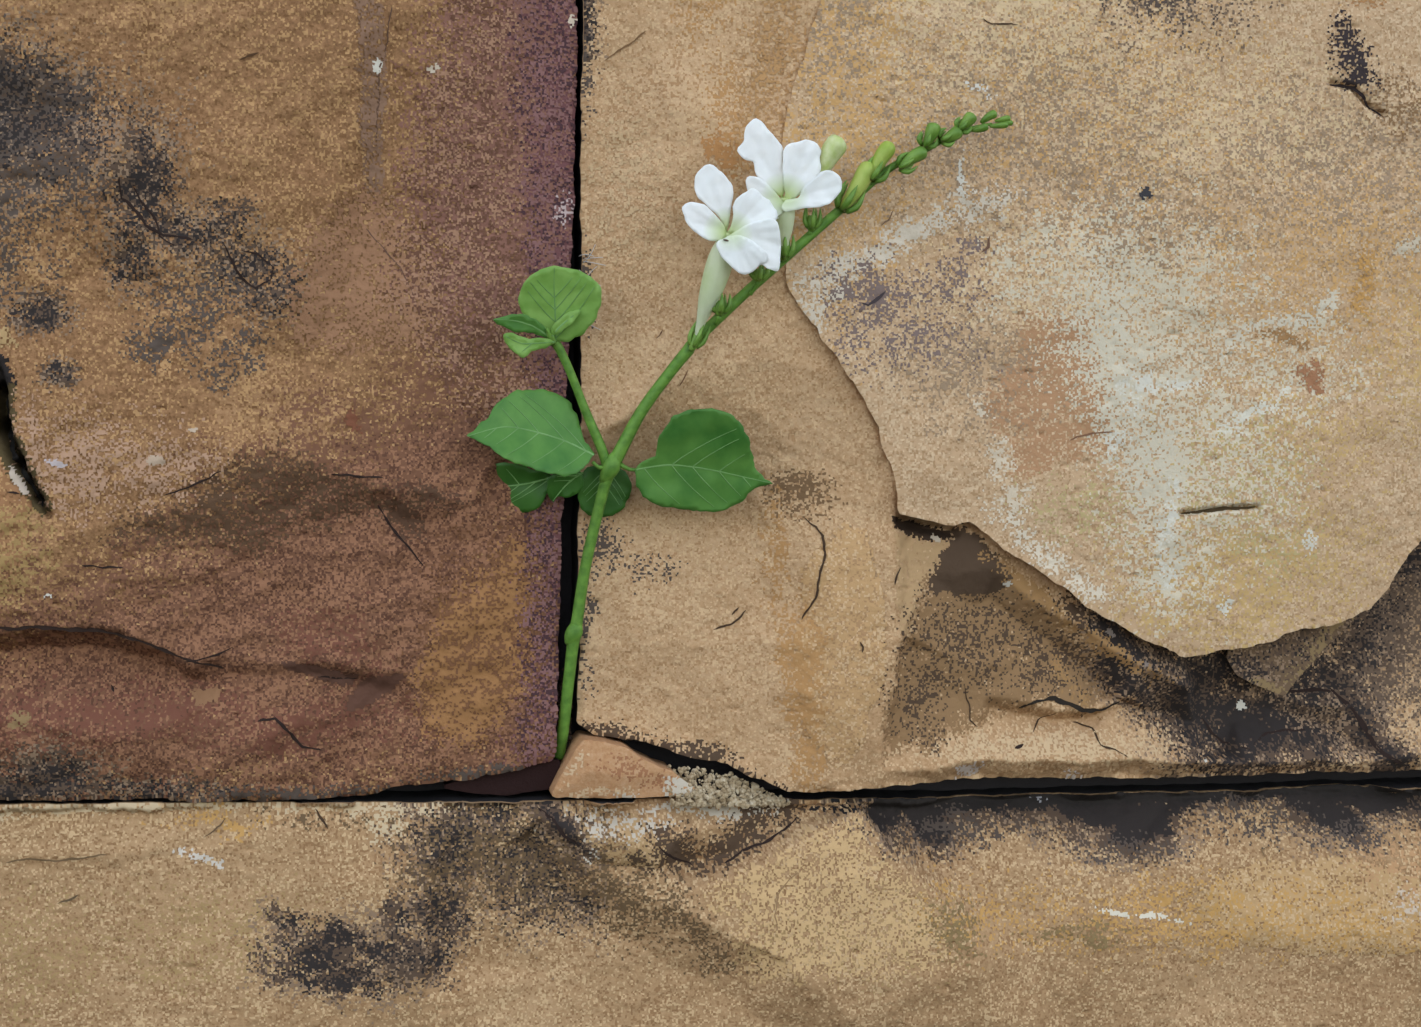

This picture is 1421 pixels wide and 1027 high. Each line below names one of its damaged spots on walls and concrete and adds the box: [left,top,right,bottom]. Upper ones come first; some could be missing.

water stain [552,0,752,297]
water stain [0,0,482,560]
spalling [0,326,19,348]
peeling [782,0,1421,772]
spalling [8,466,29,495]
water stain [760,468,848,522]
crack [802,517,826,619]
water stain [0,518,1421,1024]
crack [1015,696,1128,757]